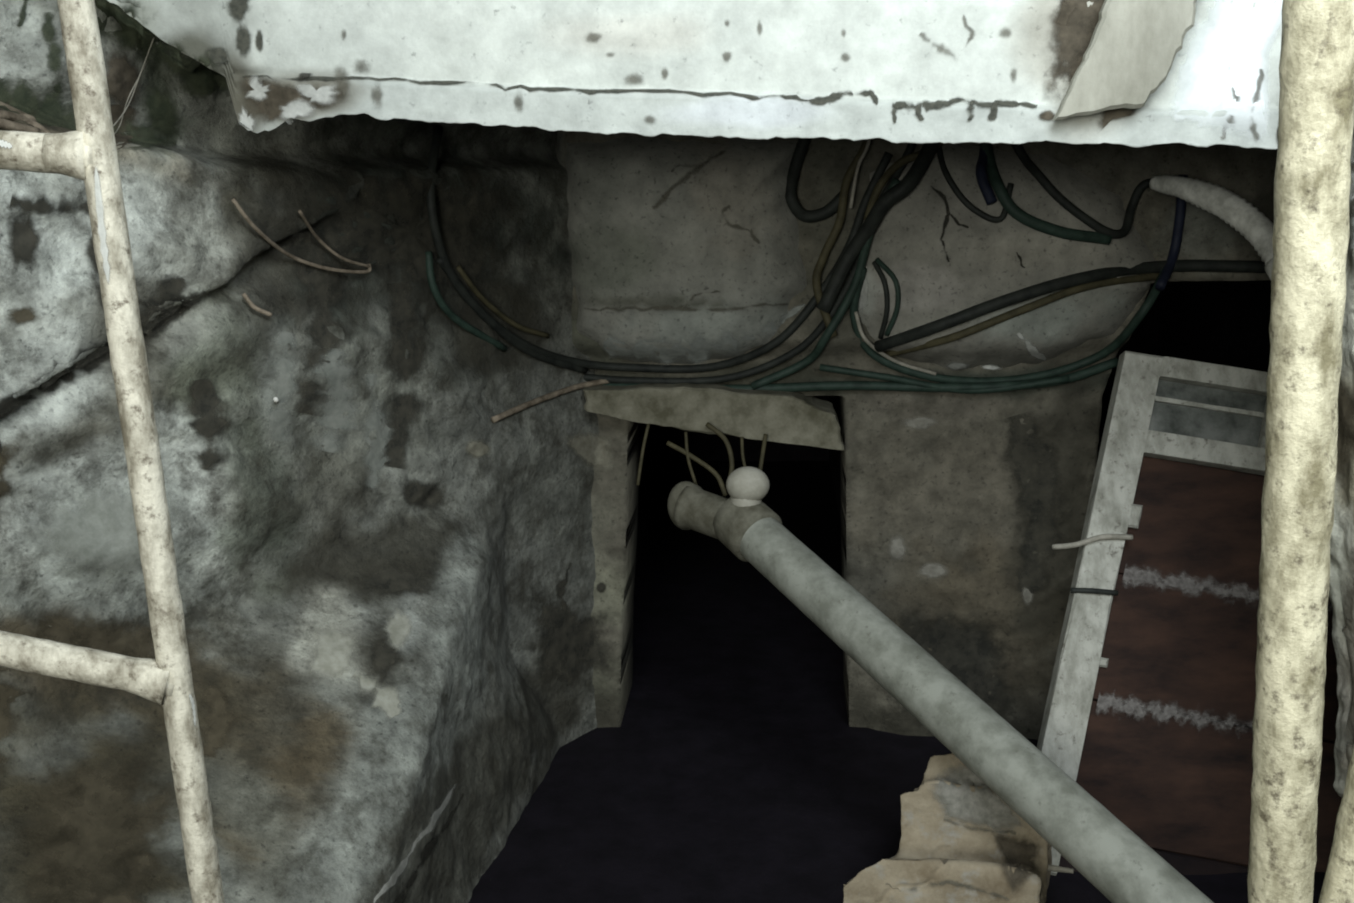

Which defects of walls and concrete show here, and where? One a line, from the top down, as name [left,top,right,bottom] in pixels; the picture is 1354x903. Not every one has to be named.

spalling [238,73,339,131]
crack [243,63,815,101]
leakage [1048,0,1105,89]
peeling [1179,0,1283,139]
leakage [141,276,186,345]
crack [138,291,206,337]
crack [0,344,110,453]
leakage [189,378,232,470]
leakage [1337,371,1354,473]
leakage [35,614,155,659]
leakage [0,667,24,762]
leakage [29,766,174,903]